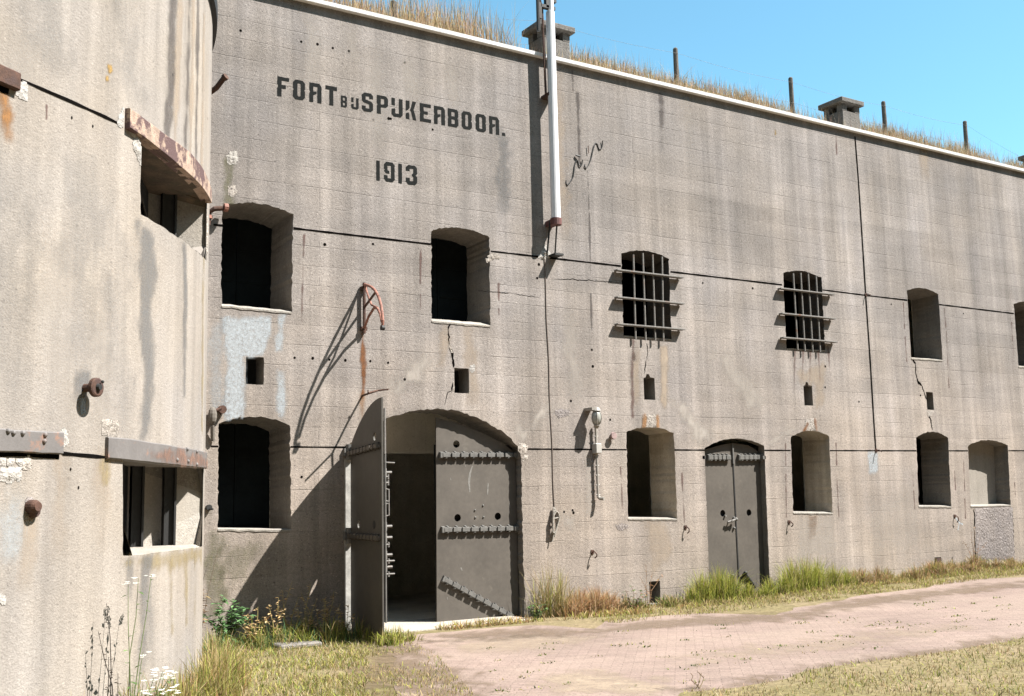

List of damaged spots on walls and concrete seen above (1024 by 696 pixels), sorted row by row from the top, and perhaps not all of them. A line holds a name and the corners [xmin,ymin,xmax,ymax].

spalling [16,81,28,101]
rust [0,92,11,130]
spalling [226,151,238,165]
damp [223,316,285,420]
crack [445,324,455,403]
crack [912,359,934,429]
spalling [101,419,120,438]
spalling [0,455,32,483]